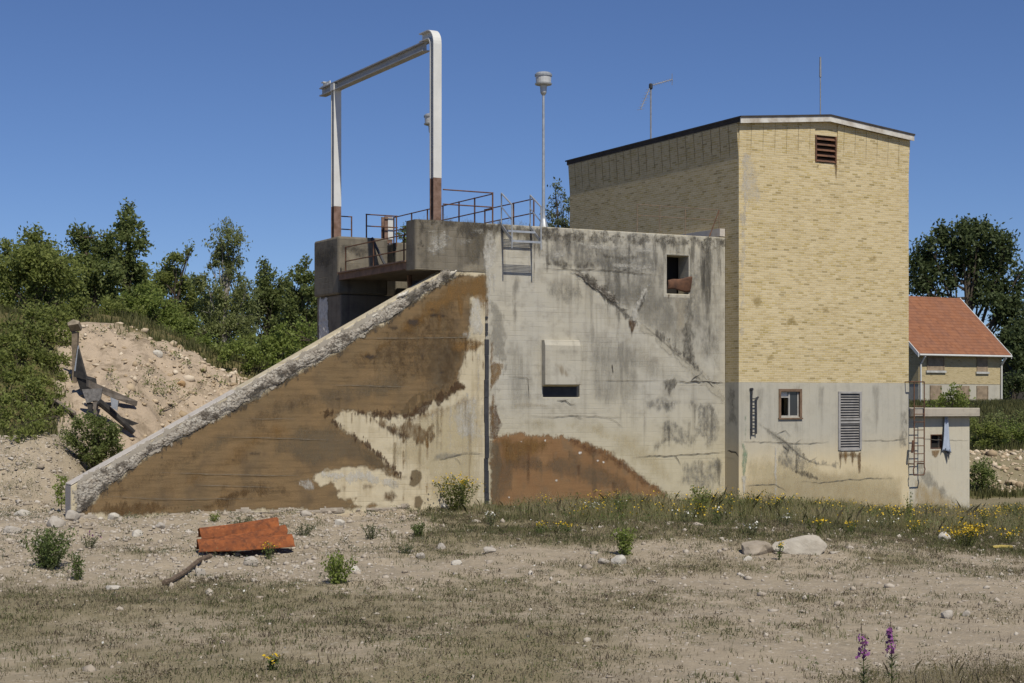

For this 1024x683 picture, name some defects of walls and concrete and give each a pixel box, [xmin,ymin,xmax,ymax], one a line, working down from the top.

spalling [77,270,465,512]
water stain [81,275,490,516]
crack [545,268,724,397]
crack [644,427,881,491]